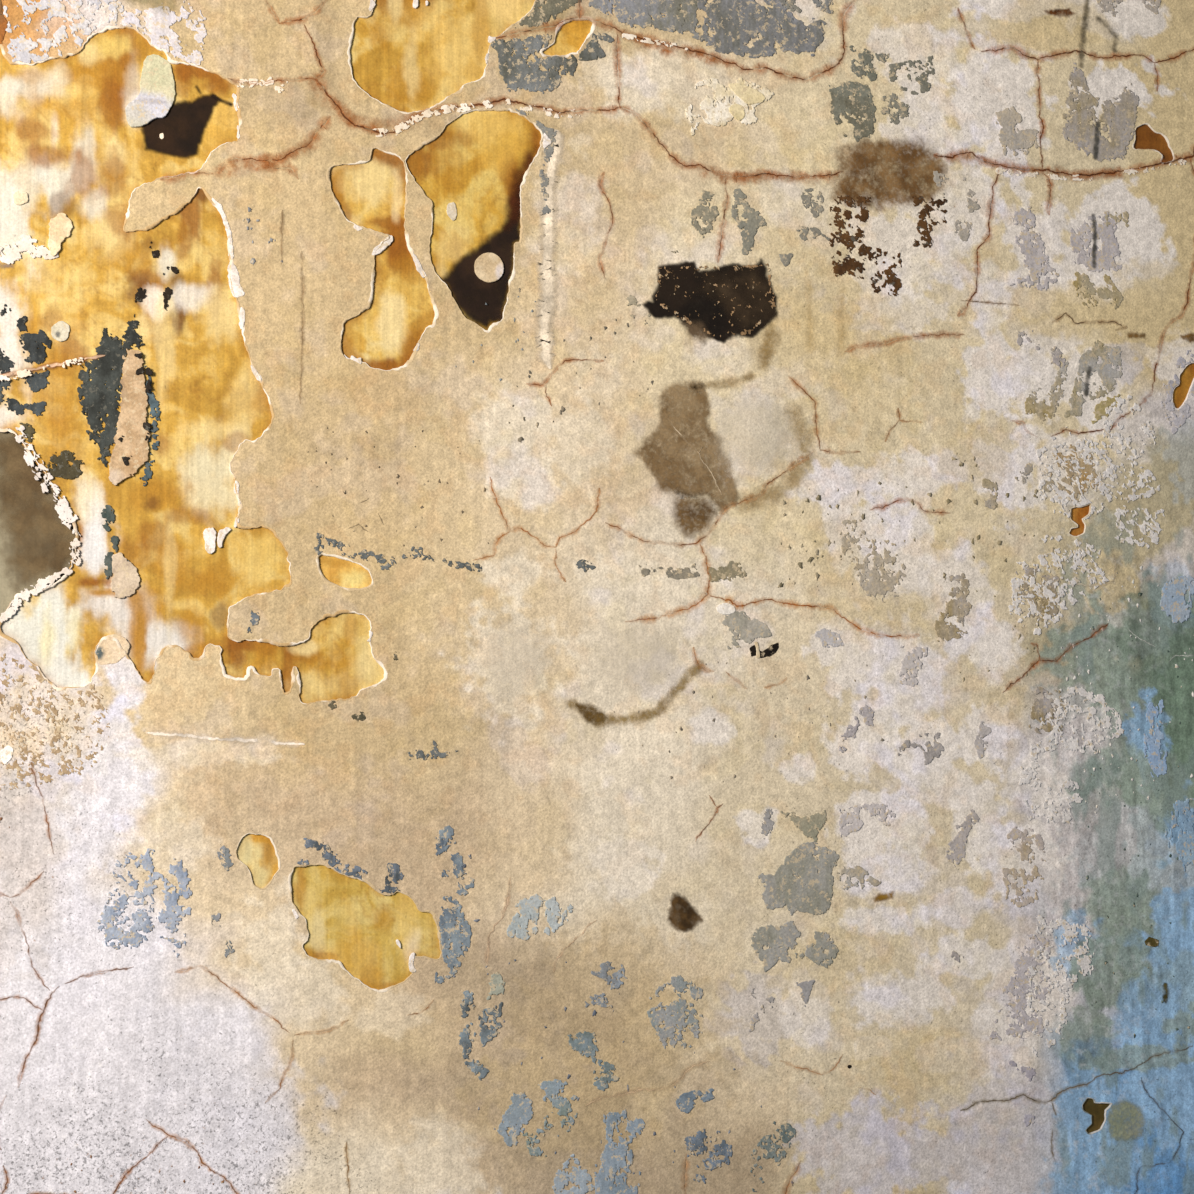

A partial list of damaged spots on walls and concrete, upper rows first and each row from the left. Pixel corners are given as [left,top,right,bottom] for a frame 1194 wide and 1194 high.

peeling [326,108,557,371]
crack [228,2,850,256]
peeling [347,0,833,114]
peeling [691,188,767,255]
crack [850,9,1194,351]
peeling [0,0,398,710]
water stain [636,374,781,535]
crack [626,471,901,637]
water stain [569,665,701,726]
crack [0,768,132,1072]
peeling [217,825,474,993]
crack [113,1120,238,1194]